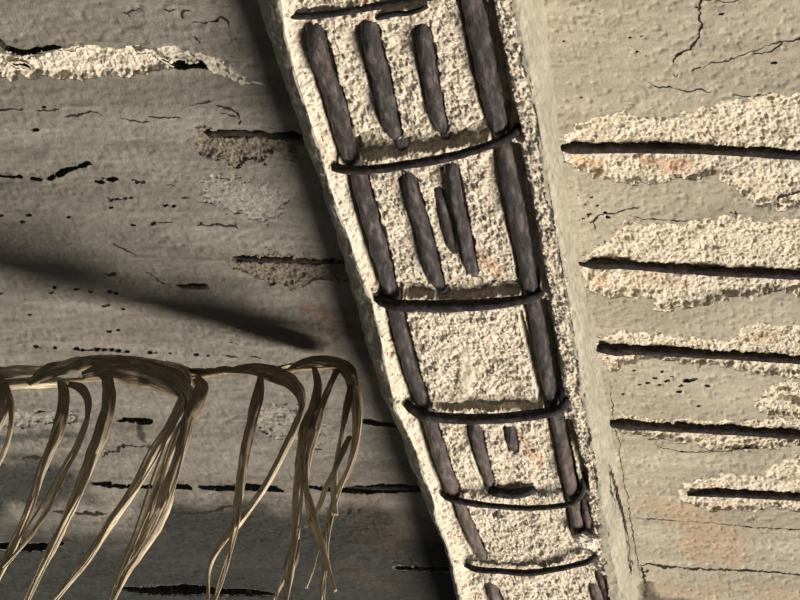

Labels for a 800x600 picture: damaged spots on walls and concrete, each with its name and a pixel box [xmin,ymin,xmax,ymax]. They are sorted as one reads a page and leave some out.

spalling [0,39,266,86]
crack [652,0,800,93]
peeling [186,125,305,226]
spalling [226,247,349,291]
spalling [281,0,610,600]
crack [588,207,688,230]
spalling [559,91,800,312]
peeling [257,403,304,450]
spalling [596,322,800,512]
crack [610,389,800,595]